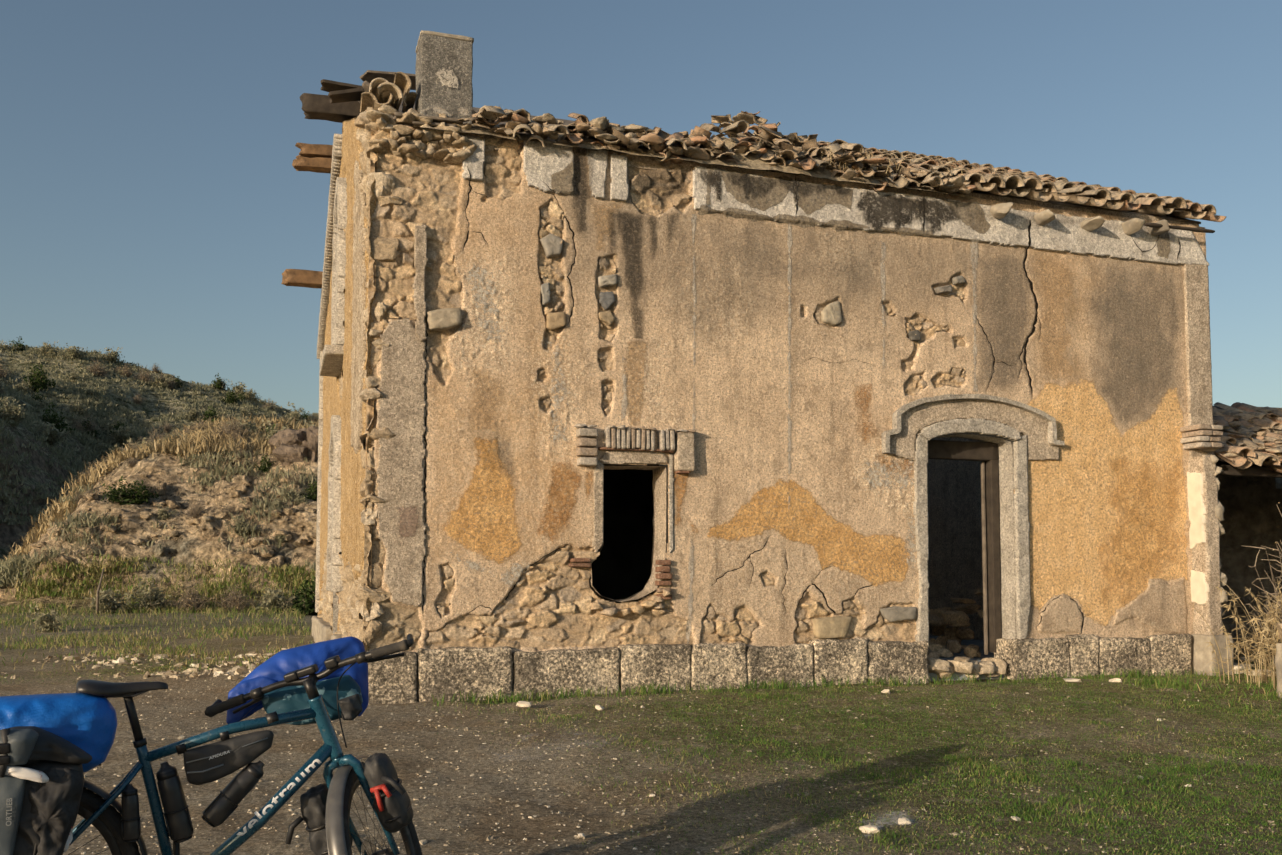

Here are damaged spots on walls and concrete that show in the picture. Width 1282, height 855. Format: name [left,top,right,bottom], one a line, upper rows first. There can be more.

peeling [436,68,459,88]
crack [463,166,488,249]
flaking render [317,72,759,651]
crack [547,185,576,324]
damp [573,148,672,424]
damp [700,170,959,366]
crack [976,221,1041,396]
crack [711,540,875,613]
peeling [707,480,918,586]
peeling [1028,379,1210,625]